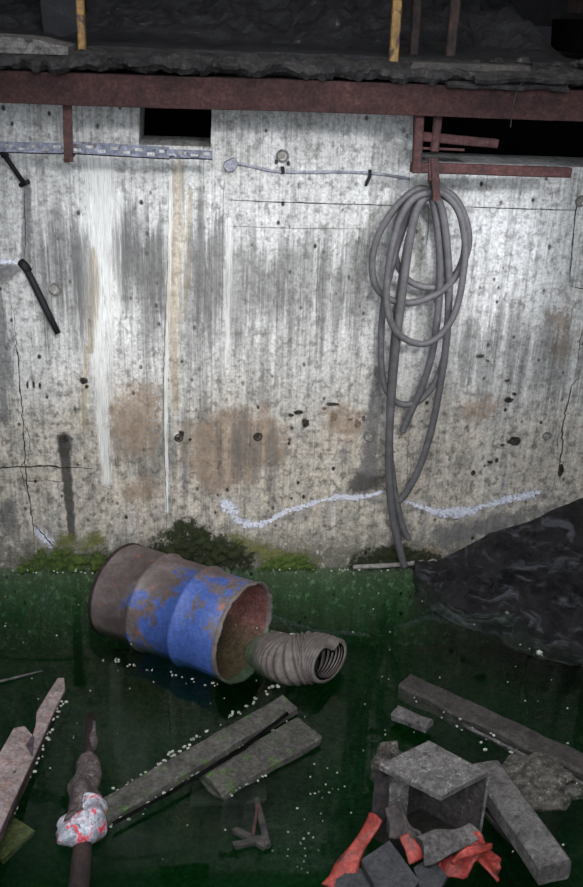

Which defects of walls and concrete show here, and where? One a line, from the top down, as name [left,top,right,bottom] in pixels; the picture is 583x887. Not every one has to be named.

leakage [34,527,55,549]
leakage [57,432,75,540]
leakage [78,150,125,485]
leakage [164,175,173,513]
leakage [225,218,233,367]
leakage [220,368,385,529]
crack [557,330,583,478]